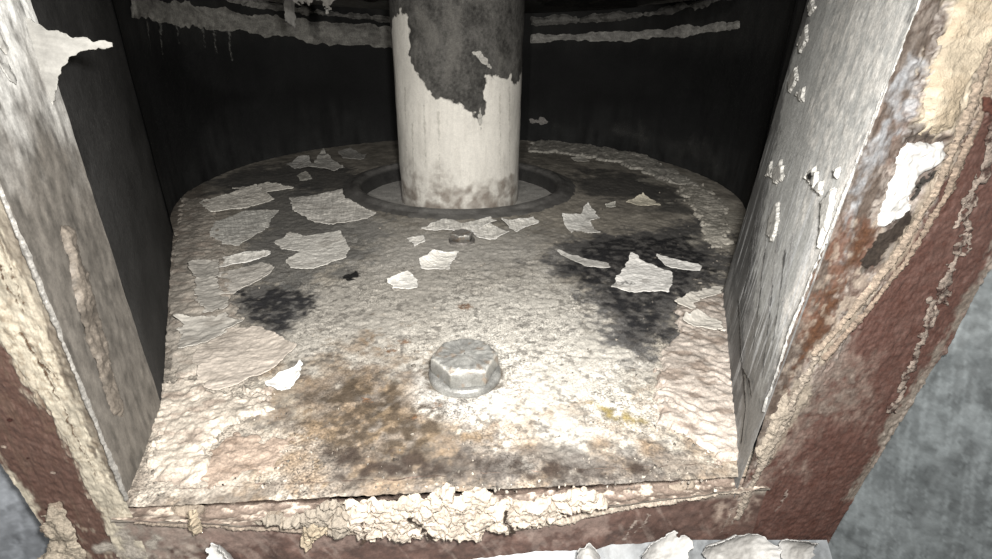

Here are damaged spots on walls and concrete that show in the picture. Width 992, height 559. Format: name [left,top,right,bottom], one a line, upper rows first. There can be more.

peeling [0,33,17,84]
peeling [25,18,113,105]
peeling [131,0,740,129]
peeling [528,139,735,248]
spalling [860,141,946,268]
peeling [387,216,539,289]
peeling [656,254,702,271]
corrosion [846,228,876,267]
peeling [145,147,376,489]
corrosion [792,290,838,369]
damp [325,448,449,478]
damp [512,460,583,479]